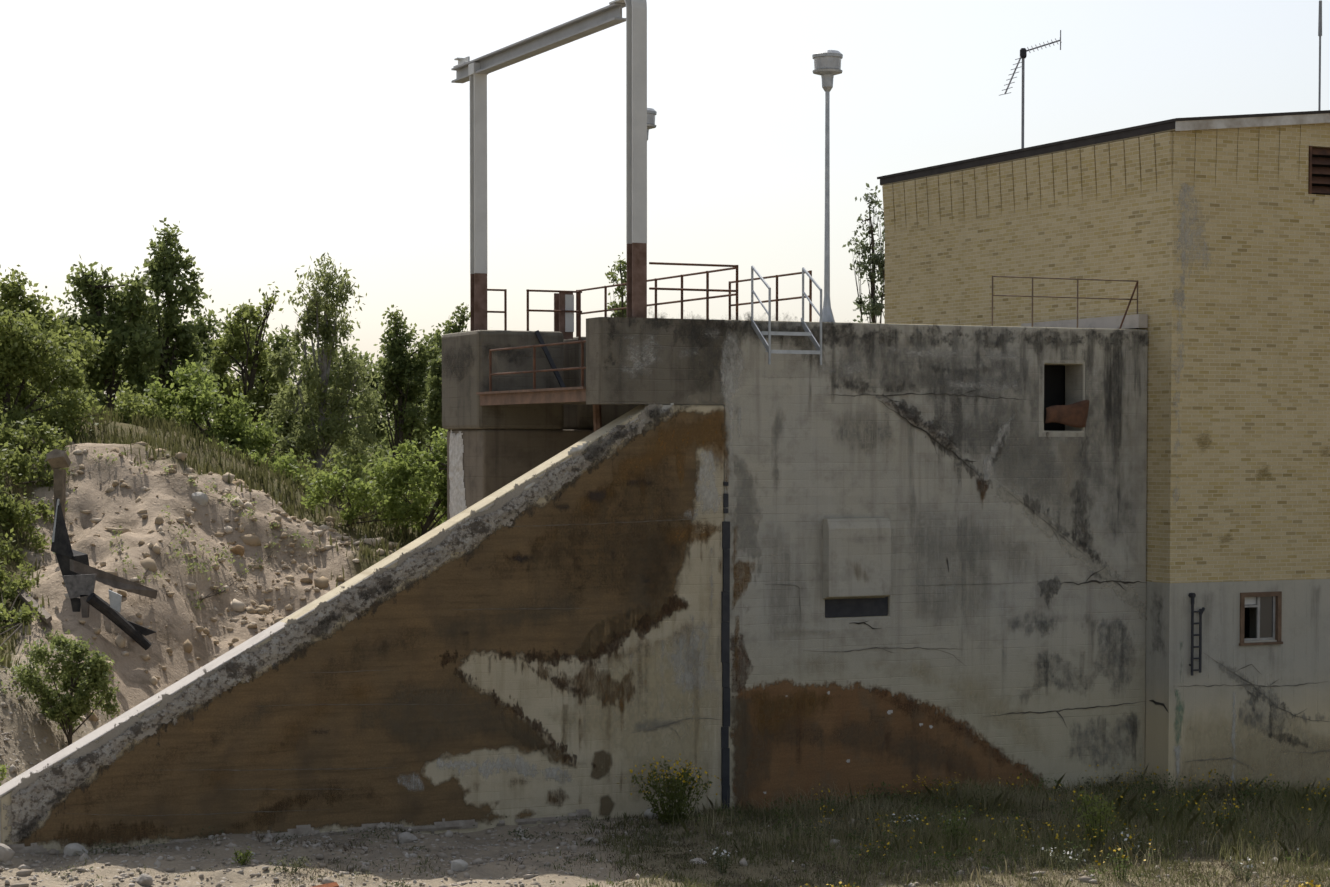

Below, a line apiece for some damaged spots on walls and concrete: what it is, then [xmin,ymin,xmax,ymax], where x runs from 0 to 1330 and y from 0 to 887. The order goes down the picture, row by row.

spalling [5,403,687,842]
damp [18,410,732,847]
crack [831,390,1145,590]
crack [985,653,1330,754]